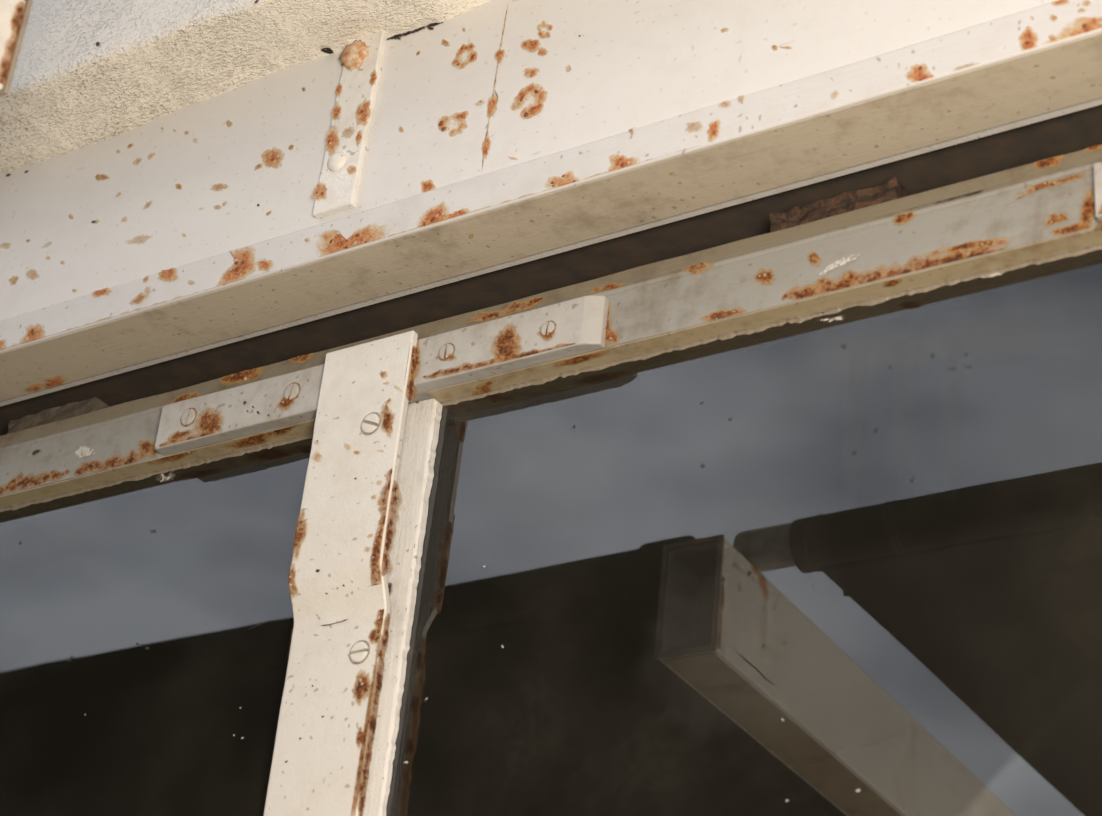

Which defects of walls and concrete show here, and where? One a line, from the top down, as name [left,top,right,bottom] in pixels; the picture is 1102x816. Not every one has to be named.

corrosion [0,1,25,85]
corrosion [1019,1,1102,50]
corrosion [326,84,370,154]
corrosion [512,68,547,118]
corrosion [320,146,696,256]
corrosion [0,248,272,350]
corrosion [782,238,1007,300]
corrosion [405,297,618,402]
corrosion [0,409,222,495]
corrosion [382,399,394,434]
corrosion [367,468,401,587]
corrosion [351,609,390,816]